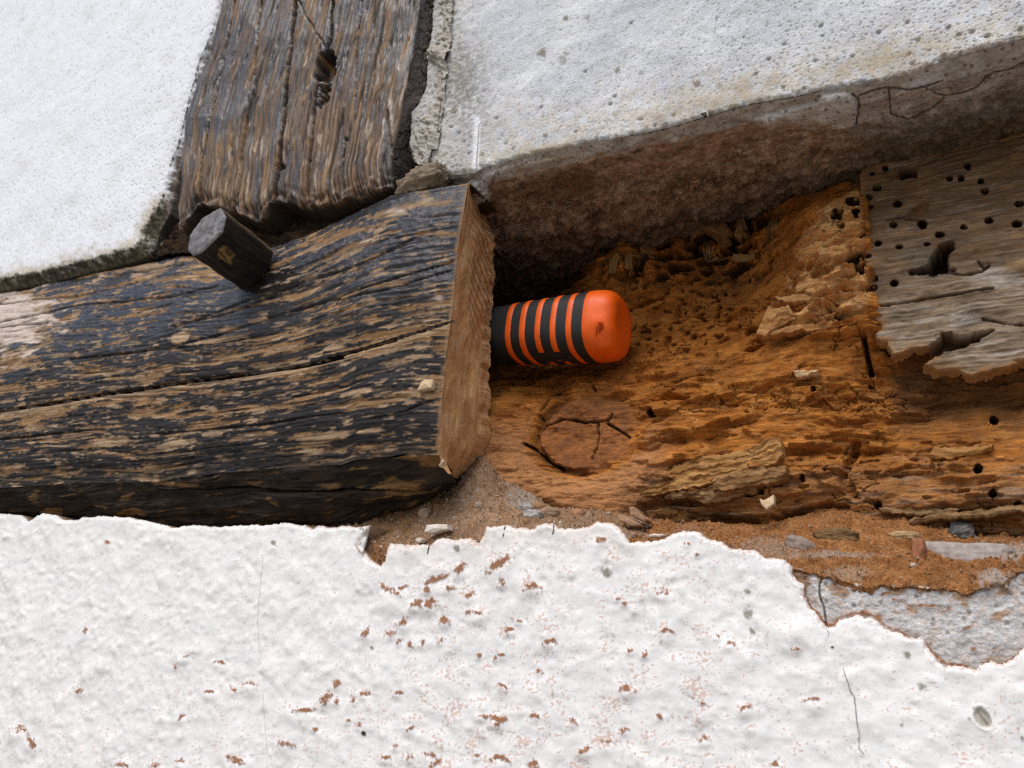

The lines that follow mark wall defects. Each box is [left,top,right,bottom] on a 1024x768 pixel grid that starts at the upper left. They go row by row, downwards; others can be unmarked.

crack [856,62,1024,122]
peeling [948,520,976,539]
spalling [793,567,1024,670]
crack [843,668,864,754]